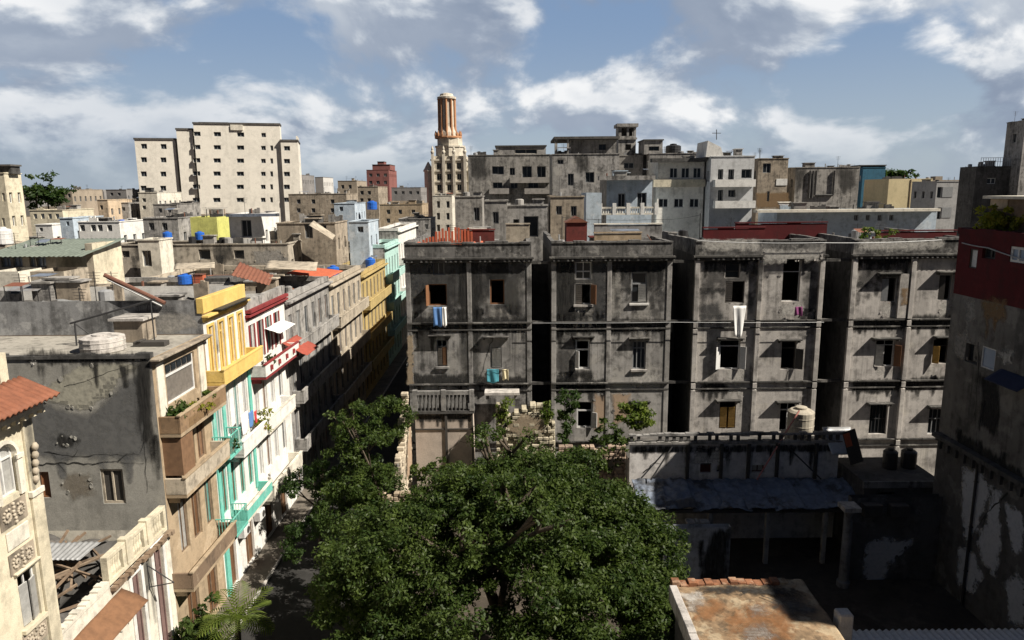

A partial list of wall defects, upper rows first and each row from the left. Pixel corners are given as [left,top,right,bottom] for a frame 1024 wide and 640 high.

leakage [27,349,160,480]
crack [39,431,148,490]
peeling [864,537,912,580]
peeling [957,466,1024,595]
peeling [1006,574,1024,624]